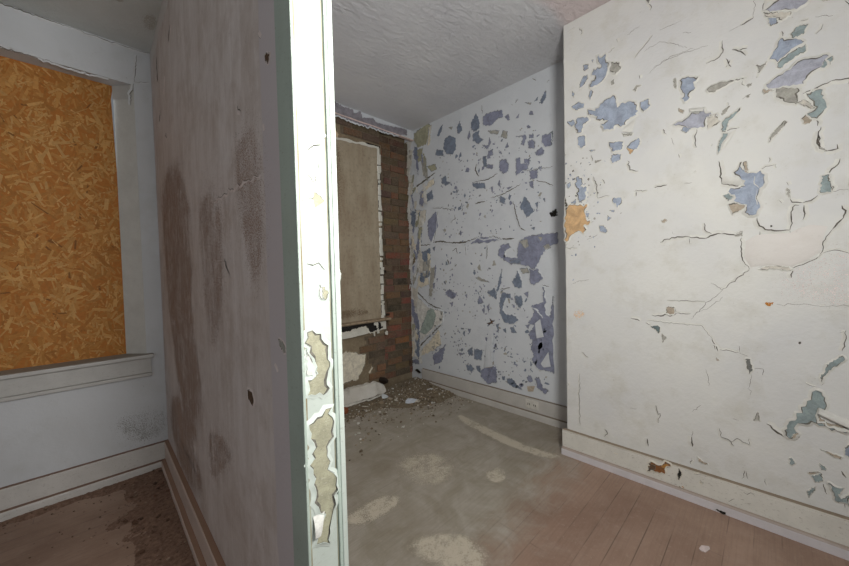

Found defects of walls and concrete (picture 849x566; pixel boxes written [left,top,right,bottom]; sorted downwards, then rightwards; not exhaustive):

crack [608,1,756,69]
peeling [671,0,835,155]
damp [336,141,345,228]
crack [710,144,742,188]
peeling [722,156,776,218]
crack [811,118,843,155]
crack [818,205,849,259]
damp [117,147,232,506]
flaking render [303,52,652,548]
crack [631,181,820,383]
peeling [752,354,849,460]
peeling [648,462,671,474]